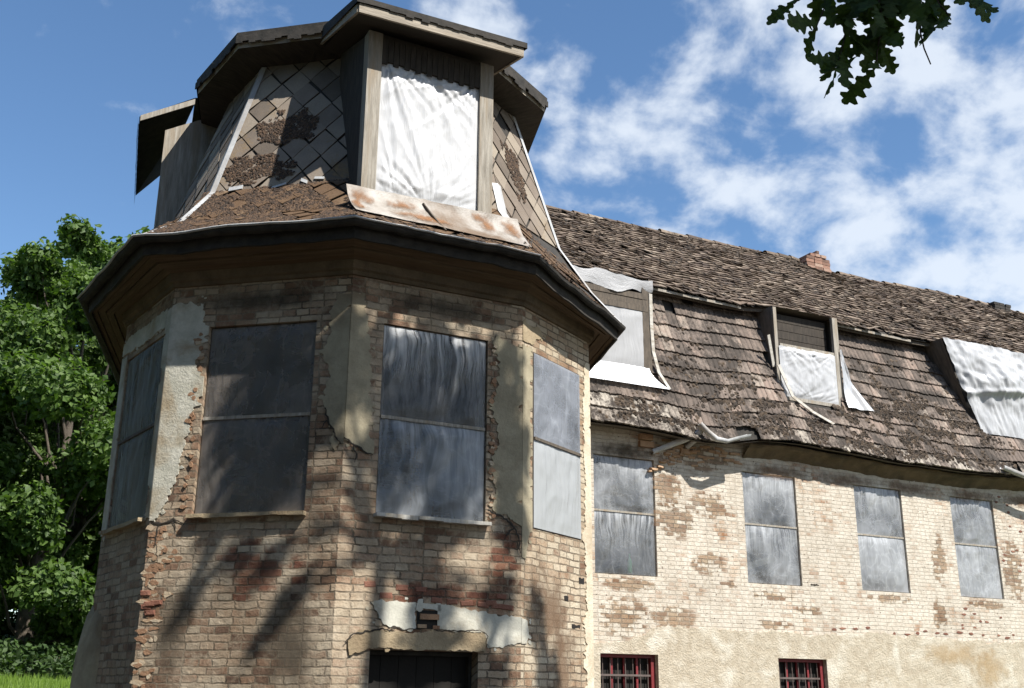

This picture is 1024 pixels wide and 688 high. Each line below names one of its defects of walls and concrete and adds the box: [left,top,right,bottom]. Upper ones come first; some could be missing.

rust [393,202,447,223]
rust [474,215,518,236]
flaking render [318,286,376,453]
flaking render [101,295,209,688]
spalling [647,439,743,537]
peeling [932,534,946,583]
peeling [1002,542,1024,600]
flaking render [347,581,532,655]